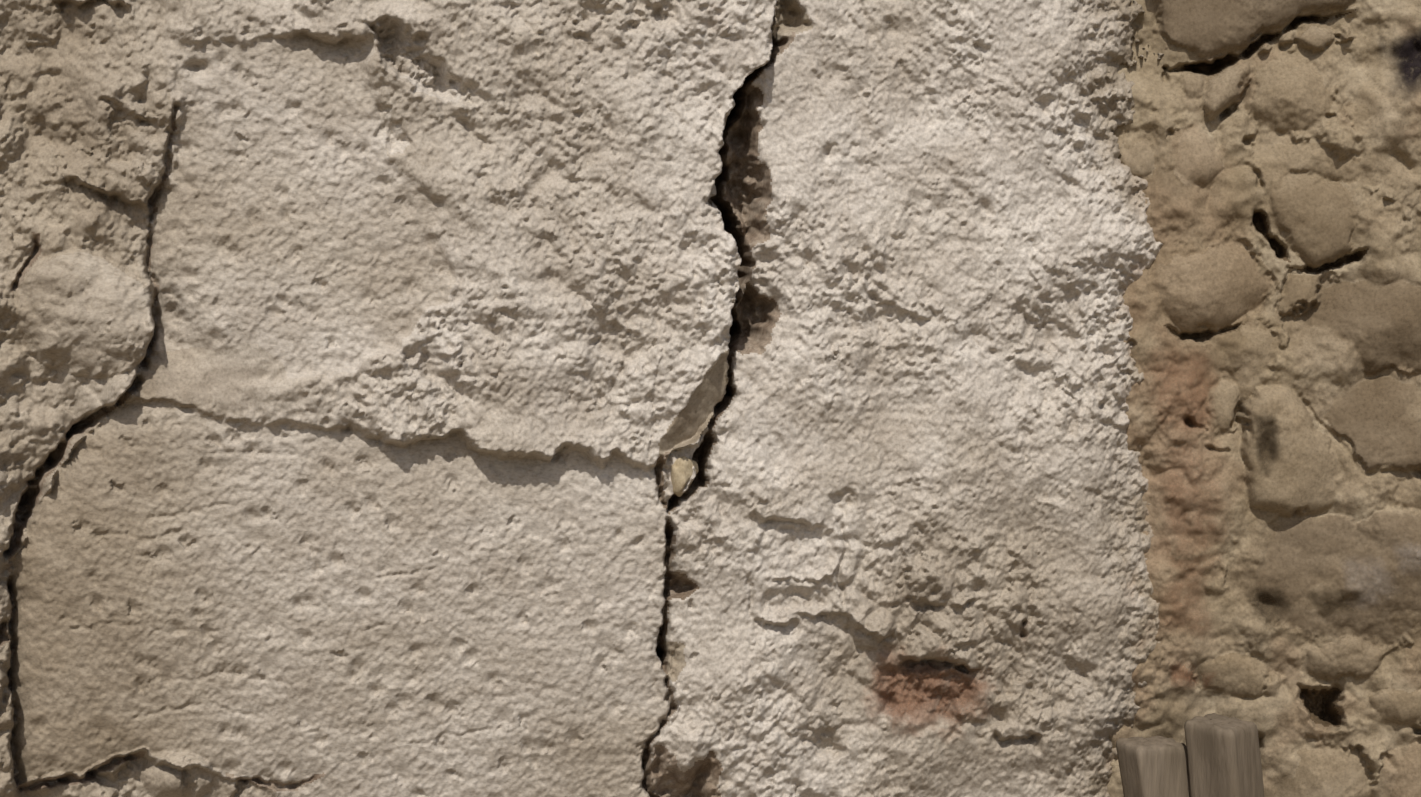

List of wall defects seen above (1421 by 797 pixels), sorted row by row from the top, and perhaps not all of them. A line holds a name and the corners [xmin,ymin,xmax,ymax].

crack [5,106,178,791]
crack [226,772,326,791]
crack [642,0,813,797]